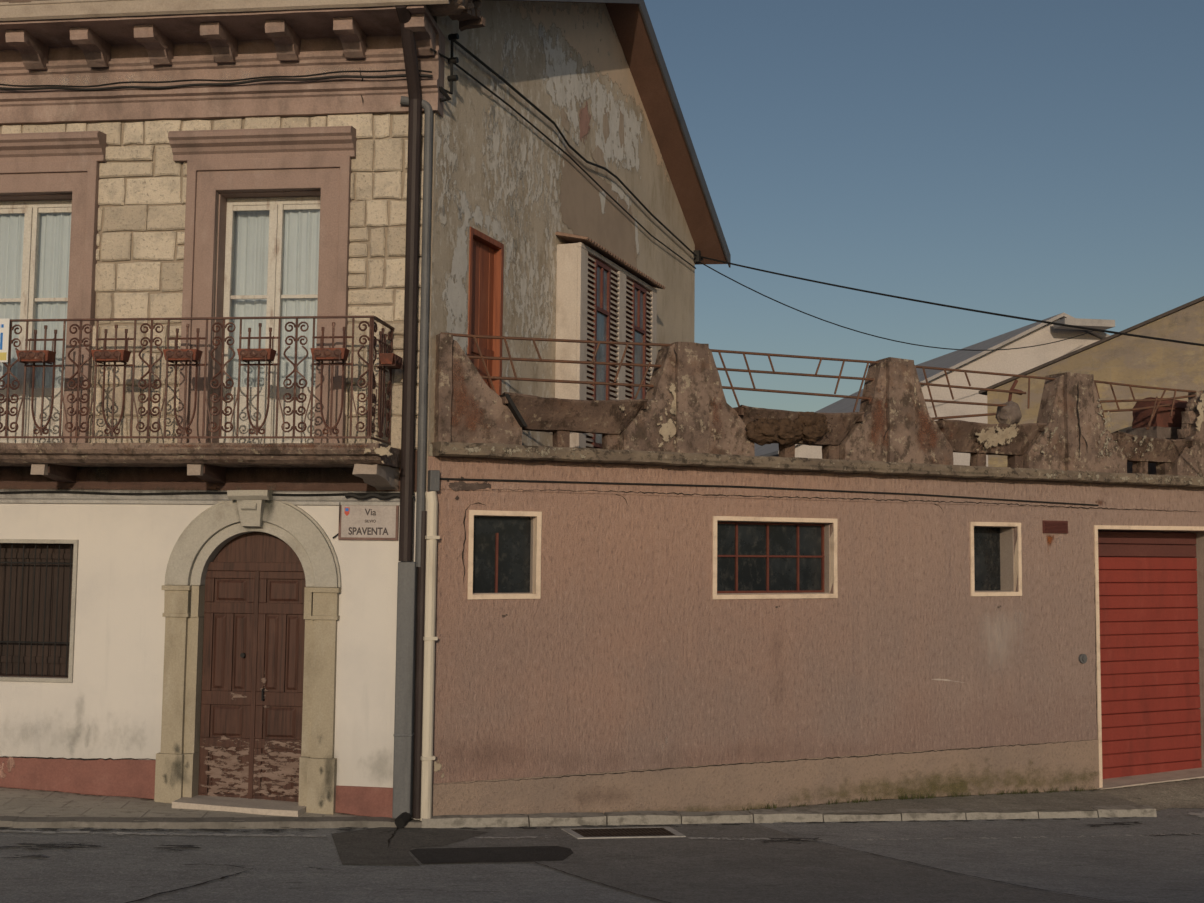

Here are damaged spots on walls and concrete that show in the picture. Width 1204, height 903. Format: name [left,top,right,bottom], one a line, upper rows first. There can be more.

peeling [435,24,643,359]
spalling [657,382,677,447]
spalling [975,418,1019,454]
peeling [201,735,302,800]